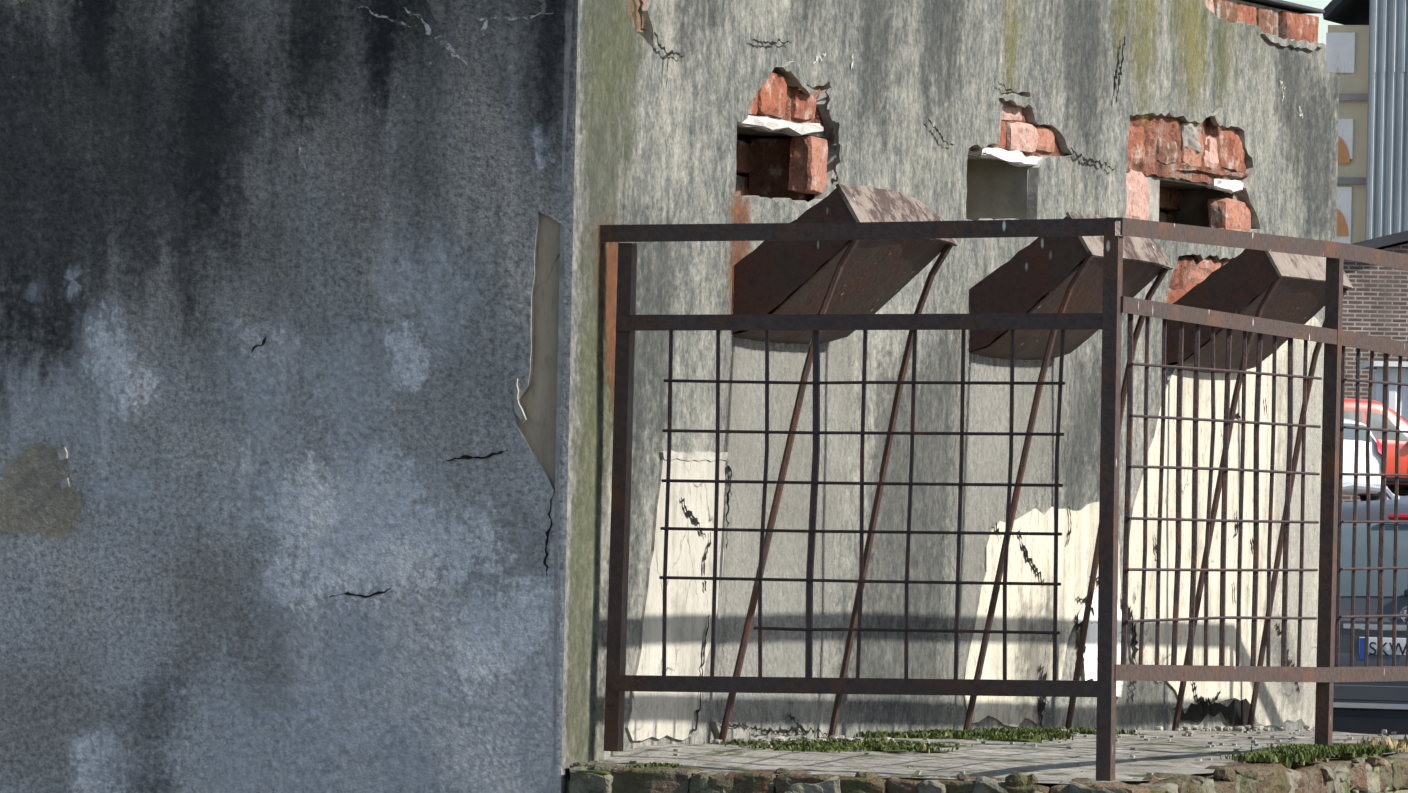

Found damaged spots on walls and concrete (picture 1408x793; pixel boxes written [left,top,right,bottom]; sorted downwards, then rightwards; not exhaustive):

spalling [1204,0,1324,50]
spalling [737,53,841,194]
spalling [969,93,1065,167]
spalling [1125,108,1251,231]
damp [0,0,268,508]
rust [729,241,750,305]
damp [195,0,642,793]
crack [446,450,508,461]
peeling [625,336,853,742]
peeling [948,334,1099,727]
peeling [1117,317,1324,731]
damp [69,727,141,793]